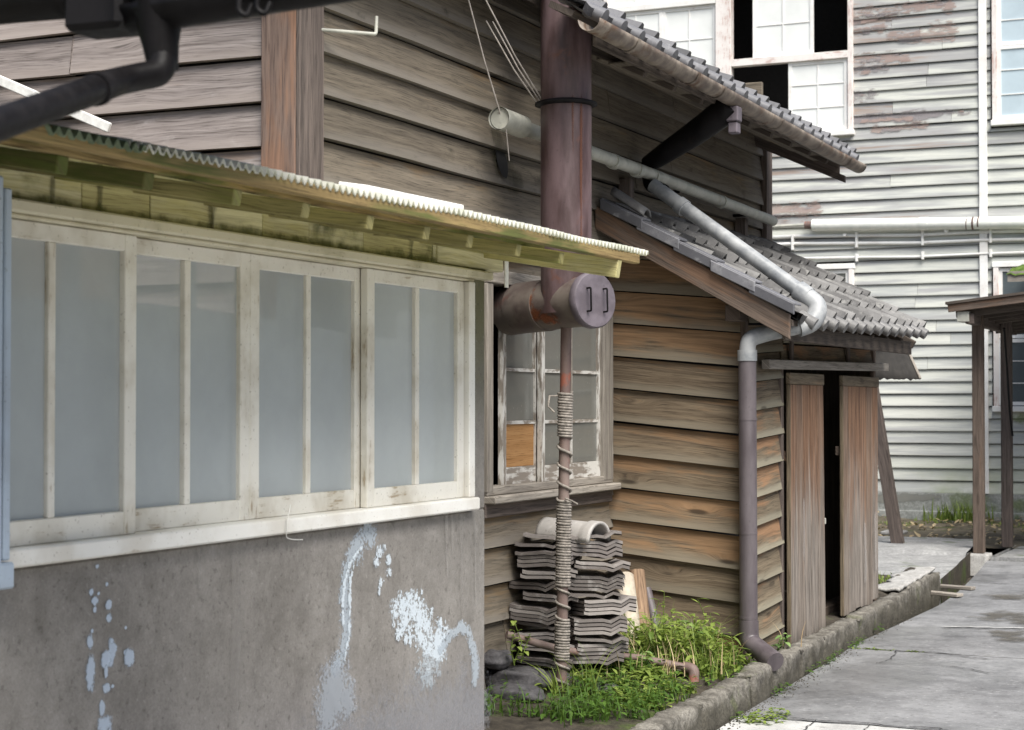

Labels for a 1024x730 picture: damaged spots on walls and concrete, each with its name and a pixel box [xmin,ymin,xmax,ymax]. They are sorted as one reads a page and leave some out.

peeling [853,0,959,75]
peeling [854,108,970,133]
leakage [89,582,112,622]
leakage [317,523,480,730]
leakage [86,629,134,730]